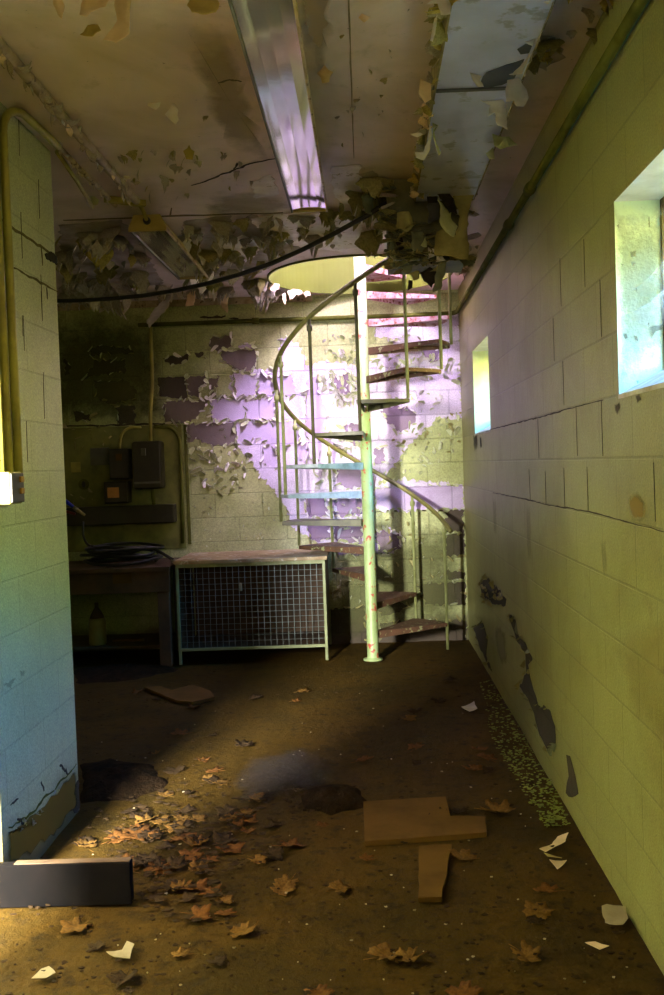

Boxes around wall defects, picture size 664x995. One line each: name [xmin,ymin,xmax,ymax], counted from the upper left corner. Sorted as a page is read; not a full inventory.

crack [191,158,275,186]
peeling [55,0,613,328]
crack [162,208,283,217]
peeling [157,313,492,671]
peeling [478,573,556,756]
peeling [9,764,76,832]
peeling [566,755,579,797]